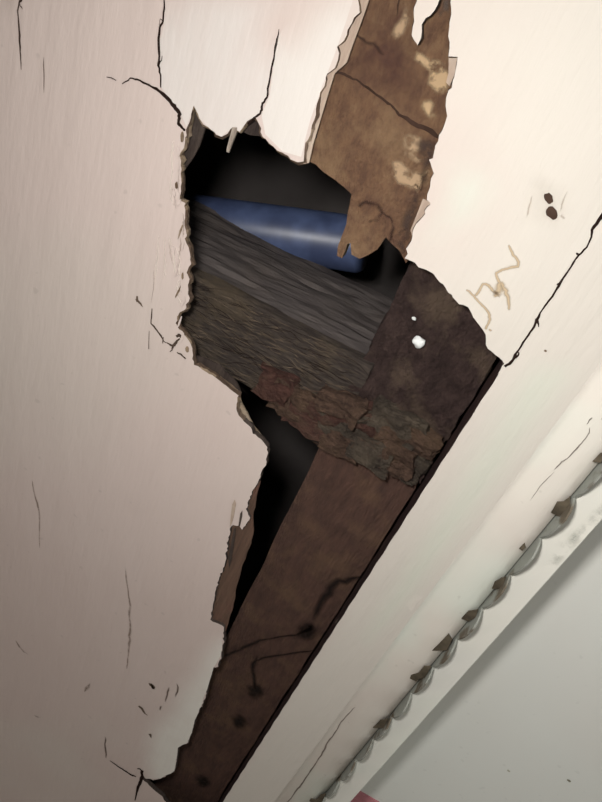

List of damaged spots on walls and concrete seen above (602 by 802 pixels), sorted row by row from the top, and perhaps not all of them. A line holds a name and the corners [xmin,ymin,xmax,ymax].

crack [15,0,23,63]
crack [107,0,186,131]
crack [247,30,279,124]
water stain [262,0,353,157]
peeling [416,53,457,92]
peeling [393,162,426,190]
water stain [359,141,508,252]
crack [148,309,186,359]
crack [504,213,602,367]
spalling [551,496,570,517]
spalling [432,633,452,651]
peeling [136,628,223,779]